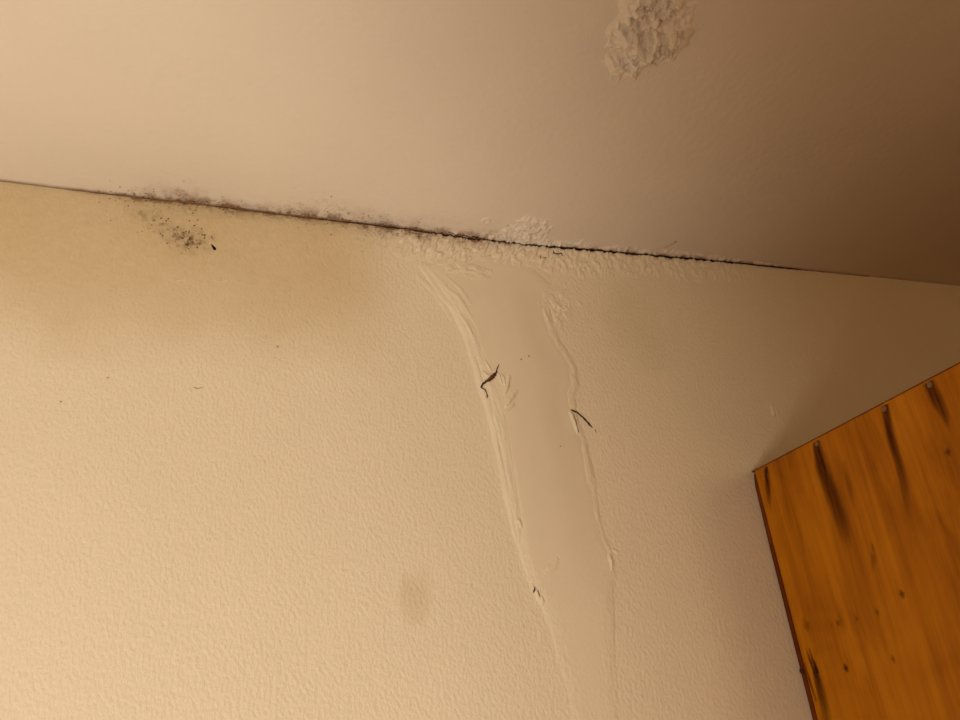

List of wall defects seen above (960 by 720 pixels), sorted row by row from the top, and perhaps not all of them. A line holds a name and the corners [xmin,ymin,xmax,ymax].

flaking render [582,0,720,99]
damp [78,189,244,258]
damp [260,210,509,244]
crack [152,199,869,277]
crack [481,365,499,398]
crack [571,409,597,433]